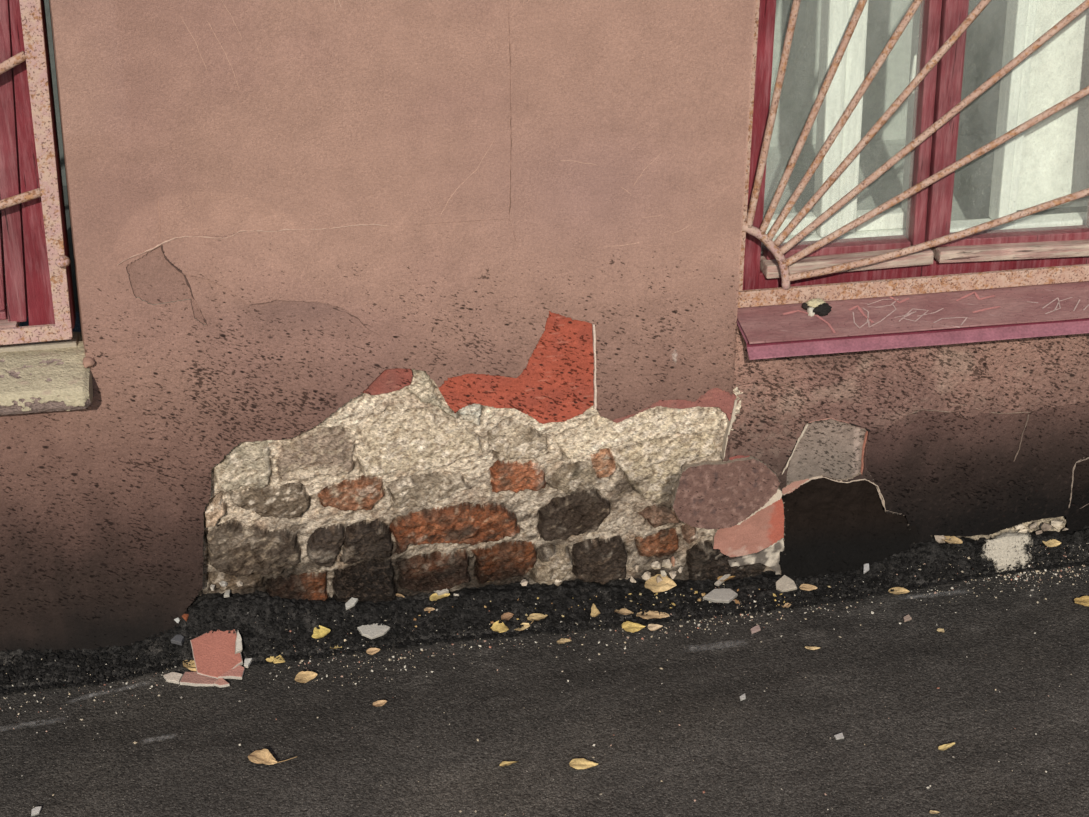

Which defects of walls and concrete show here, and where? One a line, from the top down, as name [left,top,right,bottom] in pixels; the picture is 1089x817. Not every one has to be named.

peeling [126,246,205,324]
peeling [0,358,64,379]
peeling [0,395,91,415]
spalling [194,311,1089,610]
crack [1068,457,1089,509]